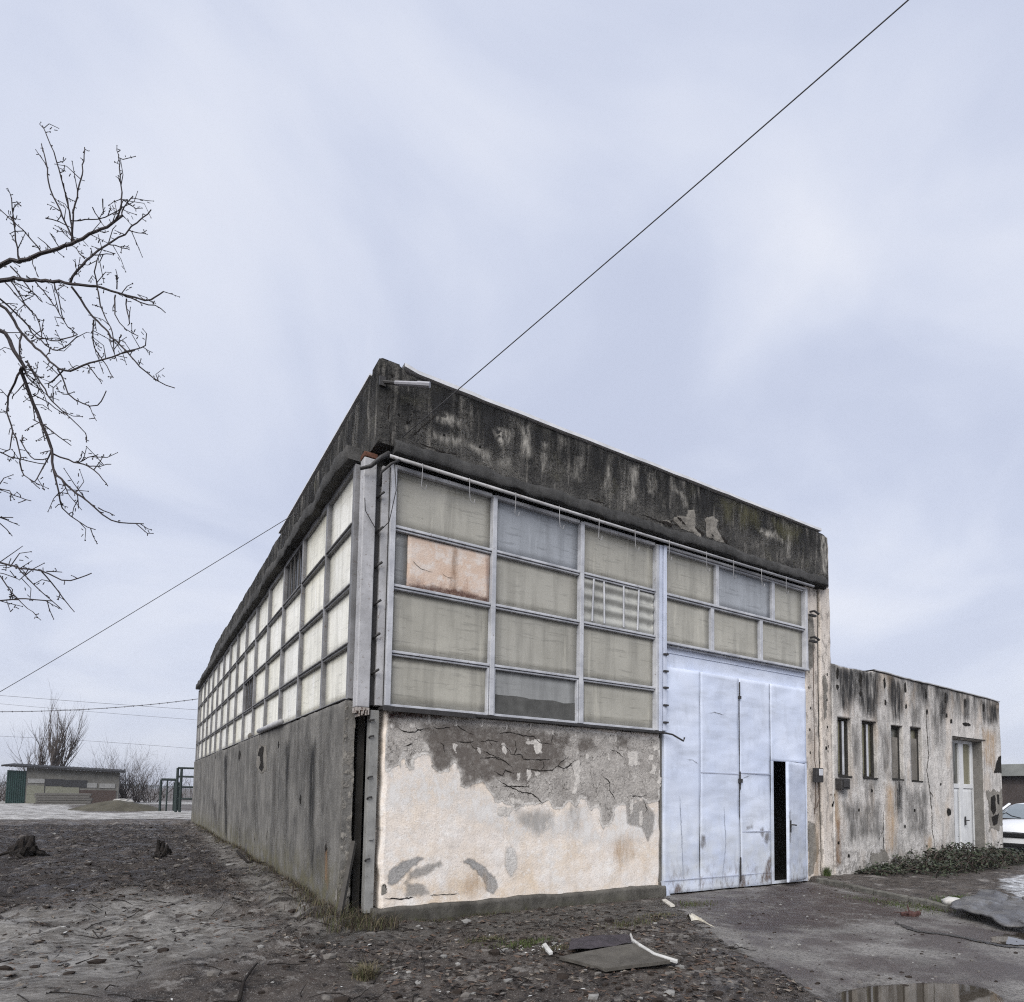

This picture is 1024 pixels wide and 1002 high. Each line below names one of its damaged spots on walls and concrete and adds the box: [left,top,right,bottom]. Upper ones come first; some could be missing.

spalling [662,510,729,545]
leakage [839,669,948,735]
leakage [983,703,997,722]
leakage [215,755,227,832]
leakage [309,748,323,821]
crack [400,725,574,802]
peeling [385,711,662,840]
leakage [848,785,878,837]
leakage [897,780,924,829]
spalling [986,789,1003,832]
peeling [381,856,440,896]
peeling [464,858,497,894]